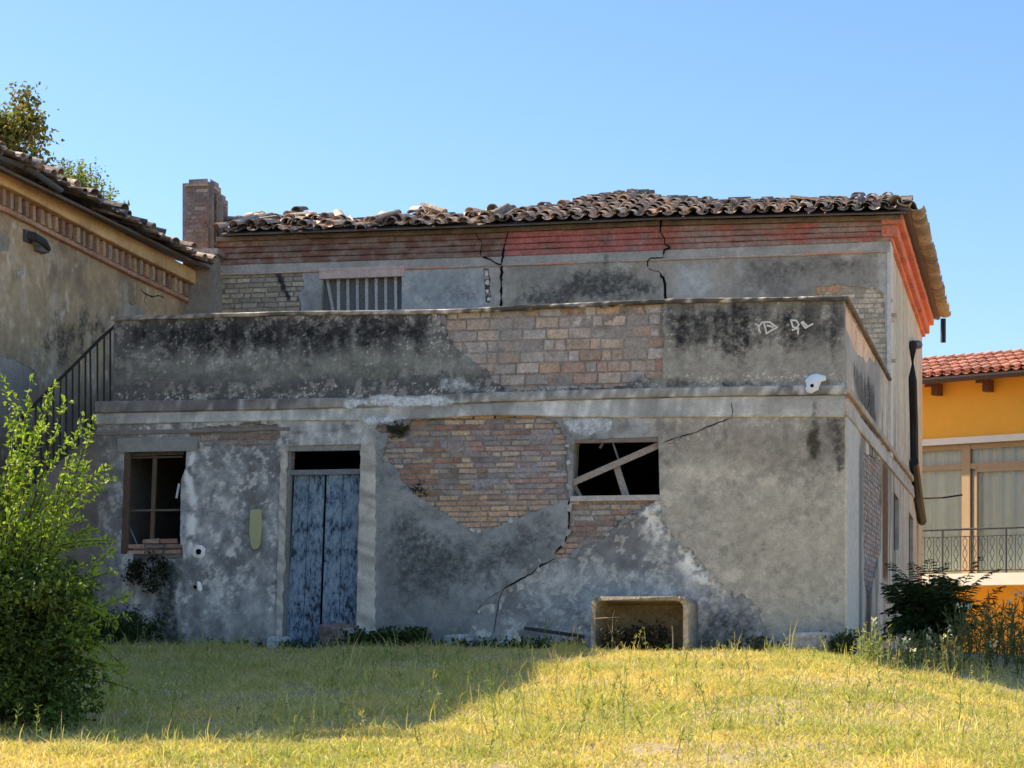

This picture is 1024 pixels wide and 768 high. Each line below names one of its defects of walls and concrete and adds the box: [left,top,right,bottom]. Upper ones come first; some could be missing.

flaking render [221,270,304,313]
crack [475,233,508,306]
flaking render [440,271,665,392]
crack [647,215,671,299]
damp [672,305,770,354]
flaking render [815,284,897,364]
crack [664,403,733,444]
damp [807,419,843,471]
peeling [344,378,769,649]
crack [474,498,570,631]